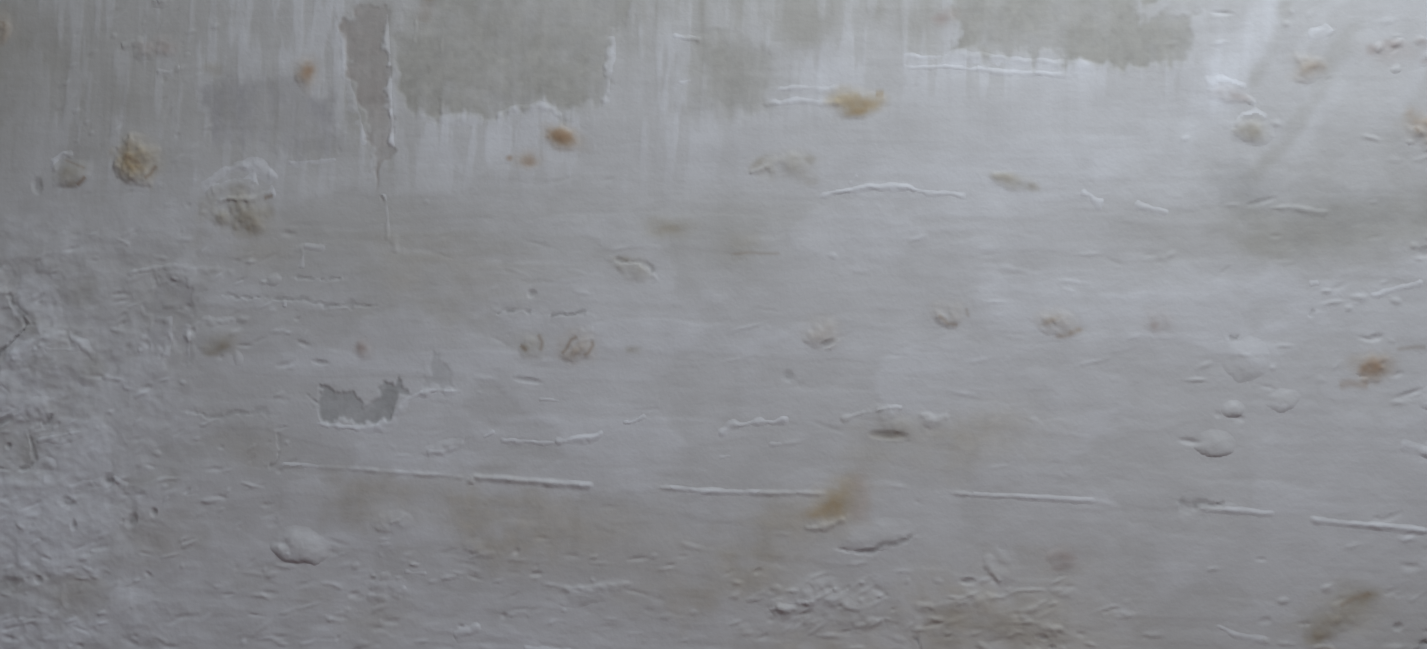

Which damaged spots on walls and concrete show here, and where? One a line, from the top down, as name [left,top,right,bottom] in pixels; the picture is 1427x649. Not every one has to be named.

corrosion [819,81,894,125]
corrosion [48,124,171,194]
corrosion [534,118,597,156]
crack [0,291,30,356]
peeling [303,358,463,435]
corrosion [1337,341,1427,395]
crack [17,413,53,473]
corrosion [791,409,934,544]